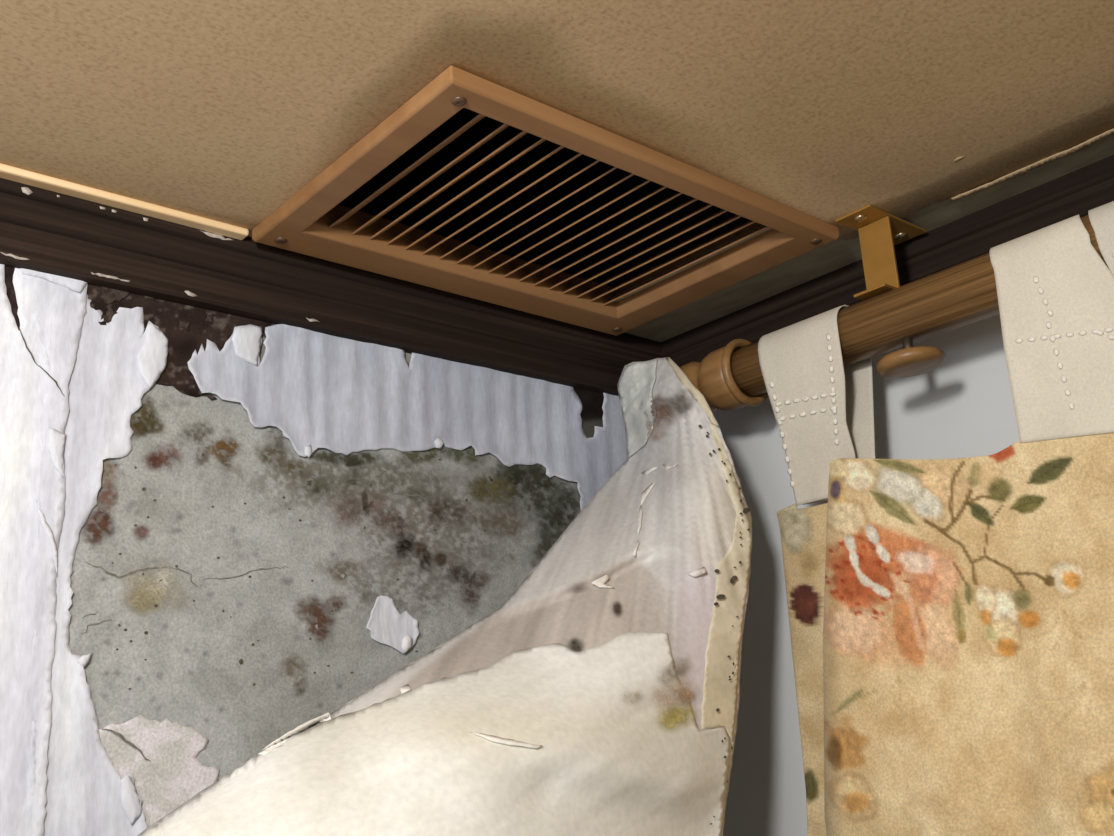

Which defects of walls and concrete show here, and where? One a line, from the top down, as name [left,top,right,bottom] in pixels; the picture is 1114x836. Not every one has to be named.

mould [130,401,162,434]
mould [650,395,690,438]
mould [134,449,177,469]
leakage [261,436,580,602]
spalling [36,322,581,781]
leakage [130,565,178,610]
mould [714,561,742,606]
leakage [656,664,692,728]
peeling [121,772,142,825]